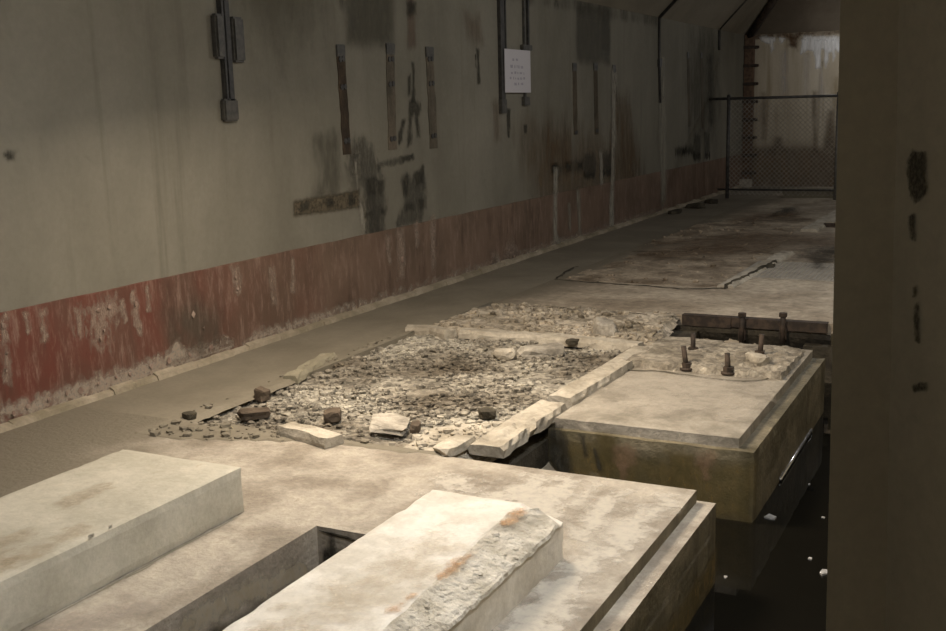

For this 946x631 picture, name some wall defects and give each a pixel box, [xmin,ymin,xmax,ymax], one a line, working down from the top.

water stain [801,35,840,69]
water stain [351,63,425,233]
peeling [74,286,150,350]
peeling [0,336,234,423]
spalling [382,508,561,631]